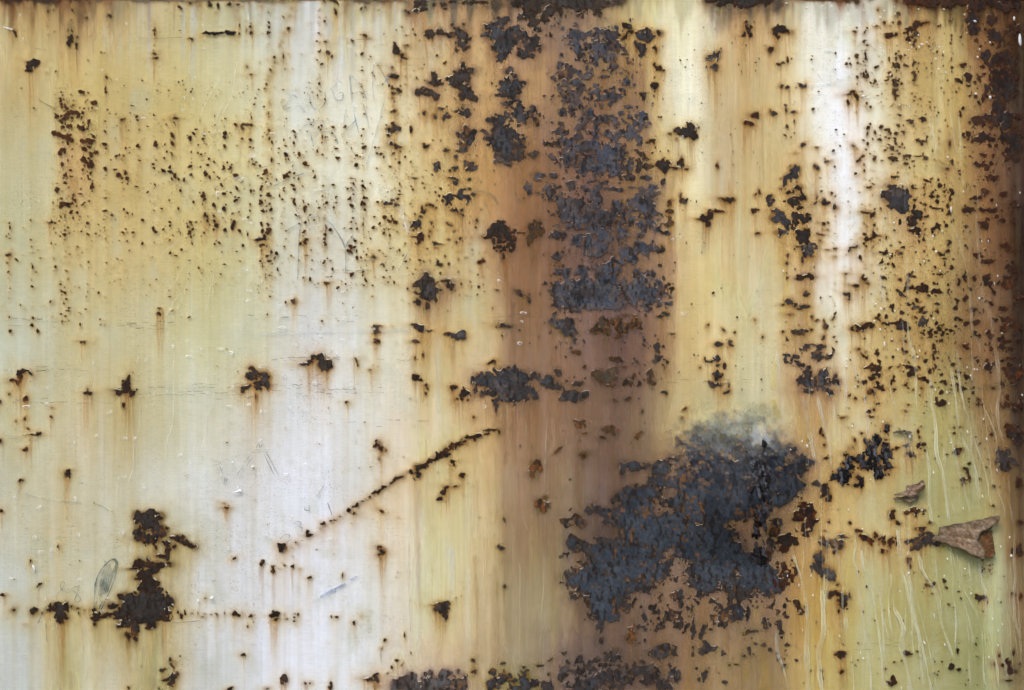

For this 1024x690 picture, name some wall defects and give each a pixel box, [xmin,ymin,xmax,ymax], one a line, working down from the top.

rust [239,365,273,407]
peeling [510,0,687,400]
rust [259,0,1024,690]
spalling [822,15,1017,498]
rust [0,508,253,690]
peeling [542,494,579,528]
peeling [559,529,801,690]